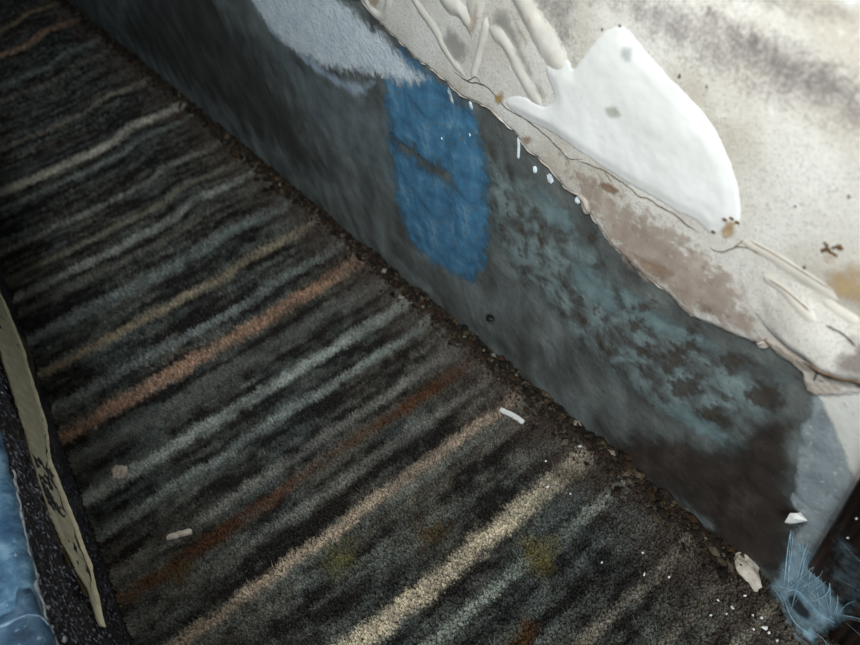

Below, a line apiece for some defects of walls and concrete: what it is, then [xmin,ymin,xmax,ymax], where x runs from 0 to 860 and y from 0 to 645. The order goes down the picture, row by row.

water stain [252,0,490,283]
flaking render [360,0,784,450]
water stain [576,172,759,341]
water stain [636,1,860,124]
peeling [751,337,860,395]
water stain [618,422,792,569]